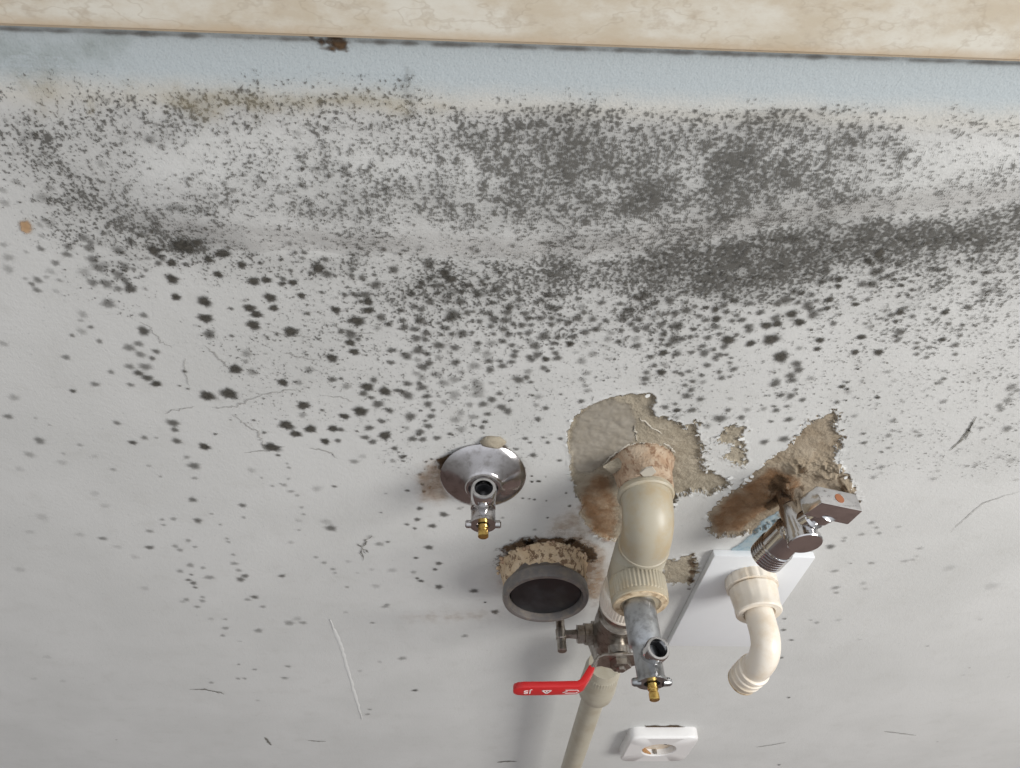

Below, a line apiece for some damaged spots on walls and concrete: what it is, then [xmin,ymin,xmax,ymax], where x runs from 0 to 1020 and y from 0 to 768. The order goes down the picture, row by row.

damp [0,72,1020,492]
spalling [566,393,861,542]